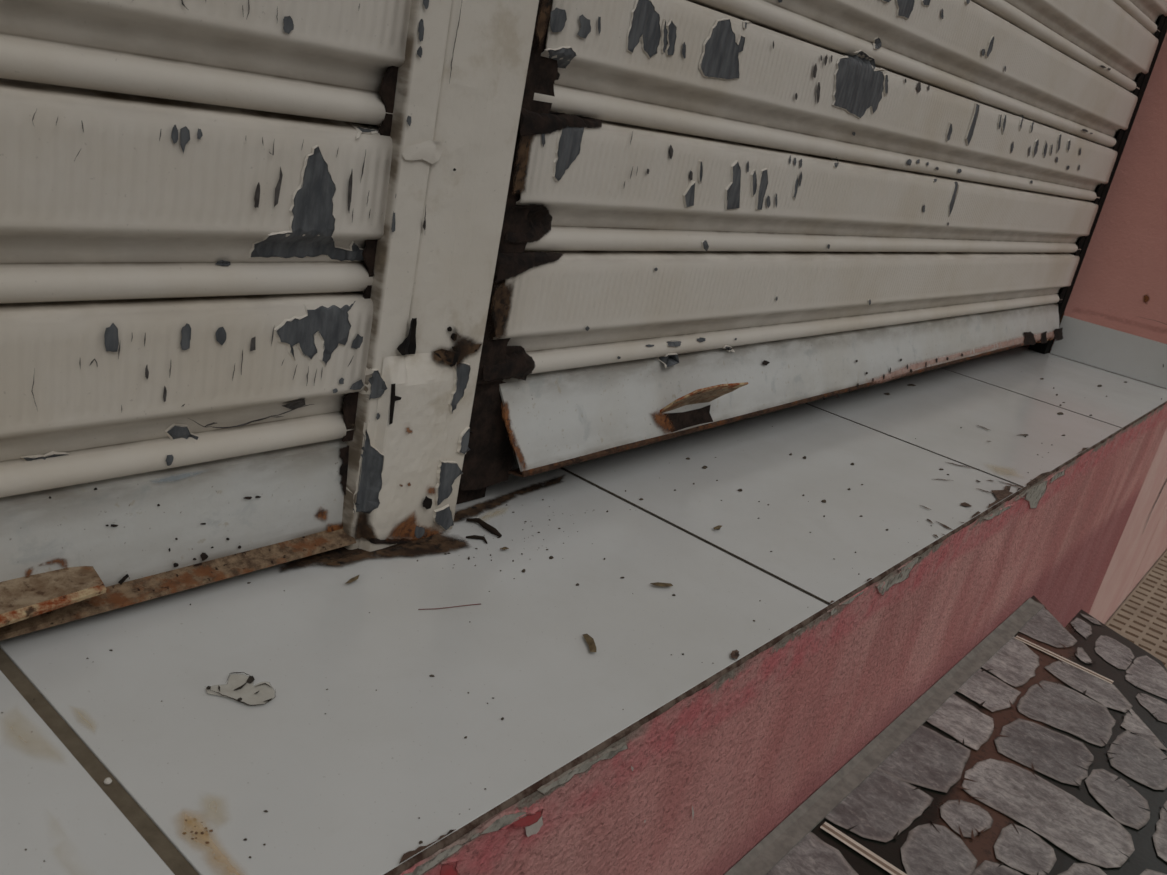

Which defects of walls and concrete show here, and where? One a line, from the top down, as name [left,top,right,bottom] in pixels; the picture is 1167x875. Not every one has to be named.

peeling [626,0,686,59]
peeling [698,18,751,80]
peeling [832,37,888,119]
peeling [248,145,364,262]
peeling [274,301,363,367]
peeling [333,367,388,400]
peeling [448,362,471,414]
corrosion [652,412,672,432]
peeling [346,413,384,514]
peeling [414,426,472,539]
corrosion [25,558,67,577]
spalling [399,742,628,875]